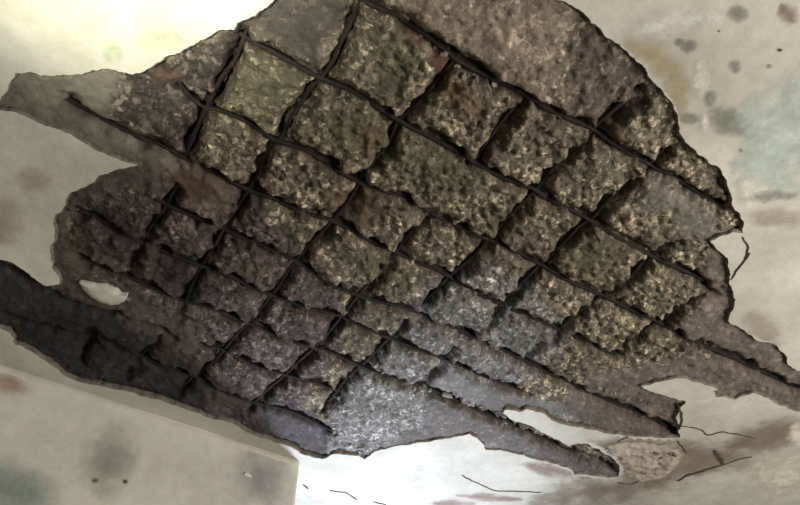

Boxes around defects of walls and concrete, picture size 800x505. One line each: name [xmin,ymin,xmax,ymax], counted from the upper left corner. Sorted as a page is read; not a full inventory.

flaking render [0,69,186,167]
spalling [111,0,451,154]
water stain [676,39,695,50]
water stain [633,46,743,133]
water stain [779,5,794,22]
spalling [282,0,744,328]
water stain [741,181,793,203]
spalling [0,106,711,482]
flaking render [673,249,800,385]
flaking render [563,351,800,436]
crack [677,402,755,482]